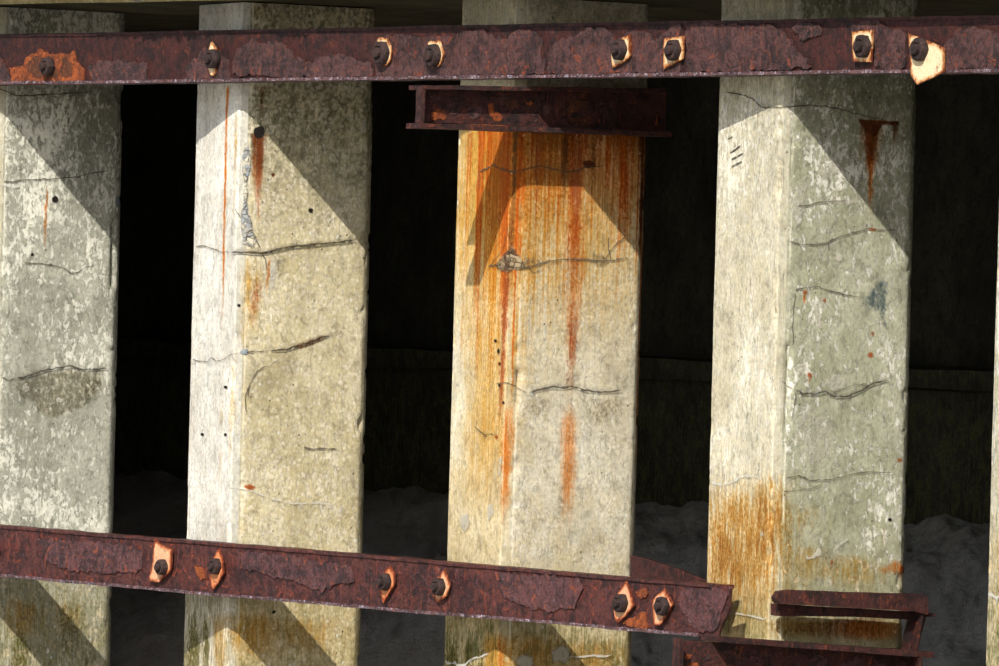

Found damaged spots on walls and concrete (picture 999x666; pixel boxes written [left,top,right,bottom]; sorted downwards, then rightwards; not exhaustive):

corrosion [850,19,908,70]
corrosion [944,26,999,69]
corrosion [488,103,503,121]
corrosion [36,537,144,574]
corrosion [193,565,207,581]
corrosion [623,612,649,629]
corrosion [677,587,729,633]